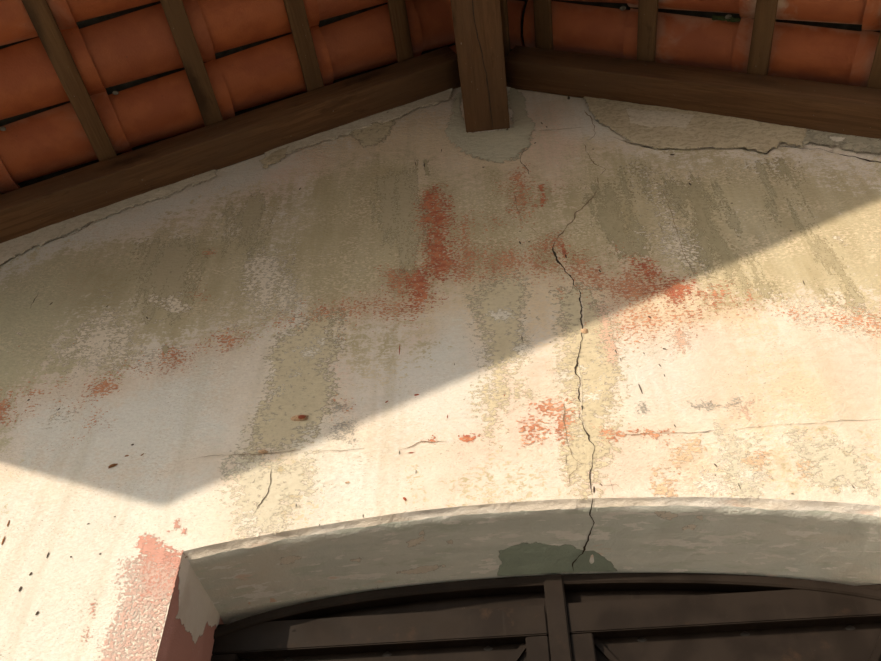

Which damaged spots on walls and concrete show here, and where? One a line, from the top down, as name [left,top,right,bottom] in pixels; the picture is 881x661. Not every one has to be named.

water stain [125,230,208,326]
rust [0,163,881,450]
crack [514,112,668,571]
water stain [580,160,783,304]
water stain [741,157,871,321]
peeling [768,281,881,339]
rust [517,397,707,497]
peeling [81,518,220,661]
peeling [497,542,617,576]